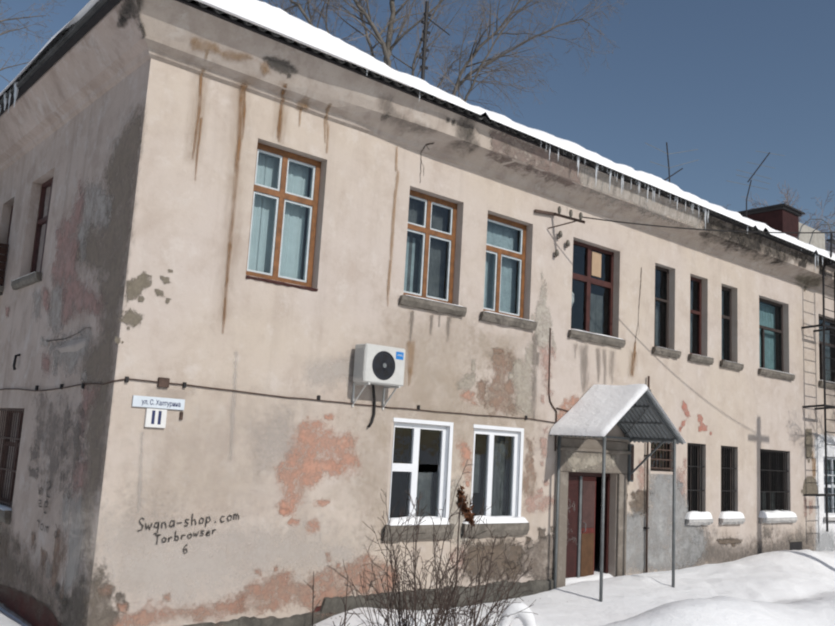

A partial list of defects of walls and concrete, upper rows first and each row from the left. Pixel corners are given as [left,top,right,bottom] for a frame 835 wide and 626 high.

corrosion [193,107,202,168]
corrosion [235,84,246,168]
corrosion [277,84,287,135]
leakage [447,118,475,151]
flaking render [119,269,173,330]
leakage [28,115,145,584]
peeling [457,273,557,416]
peeling [679,401,712,435]
peeling [278,414,360,532]
peeling [0,553,399,626]